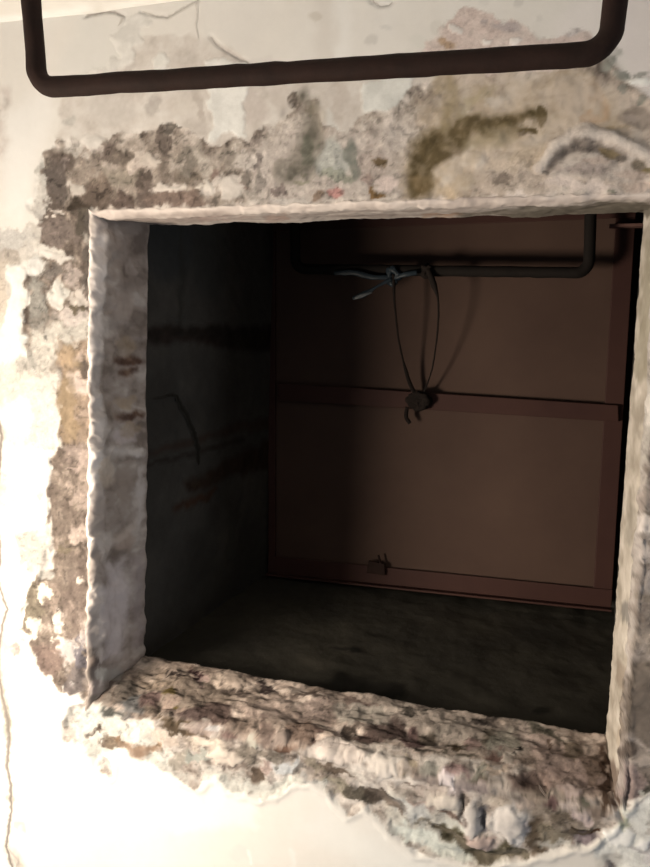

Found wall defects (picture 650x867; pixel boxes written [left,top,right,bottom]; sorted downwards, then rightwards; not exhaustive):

leakage [69,11,257,75]
crack [85,0,251,64]
crack [365,0,392,8]
peeling [421,5,594,52]
peeling [483,68,577,78]
leakage [54,46,650,201]
peeling [472,152,650,198]
peeling [0,78,429,697]
crack [0,361,28,867]
spalling [61,330,650,867]